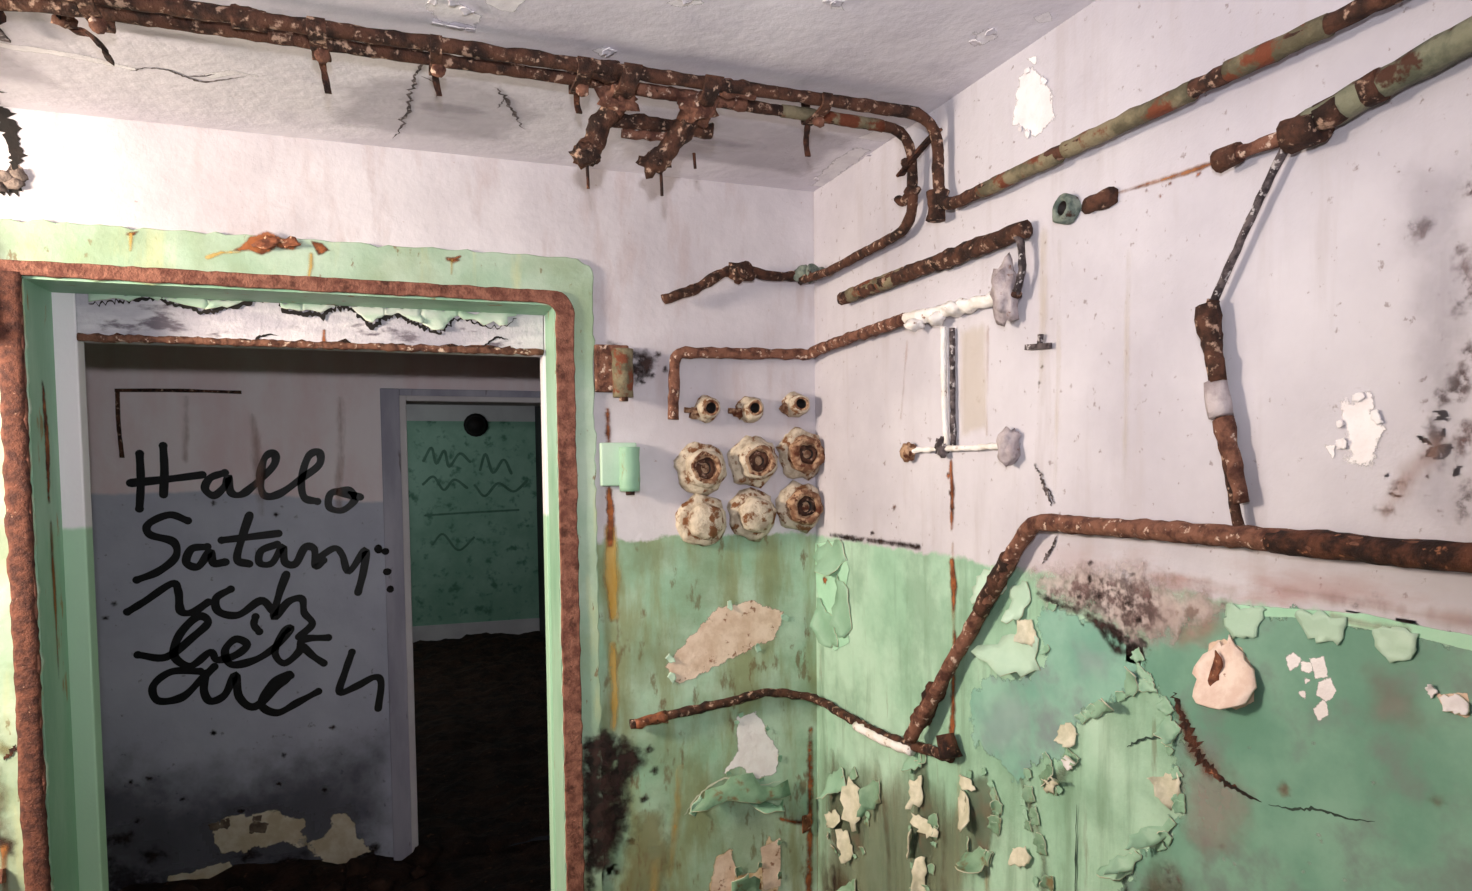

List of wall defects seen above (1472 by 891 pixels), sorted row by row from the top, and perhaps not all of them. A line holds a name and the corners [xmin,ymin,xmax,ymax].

crack [0,92,28,197]
crack [392,64,437,139]
corrosion [205,231,328,276]
crack [247,330,511,353]
leakage [1440,346,1472,401]
leakage [1430,422,1472,454]
mould [1037,561,1224,654]
peeling [955,581,1472,891]
crack [1170,692,1261,802]
spalling [168,809,371,881]
peeling [815,767,881,891]
peeling [900,752,939,891]